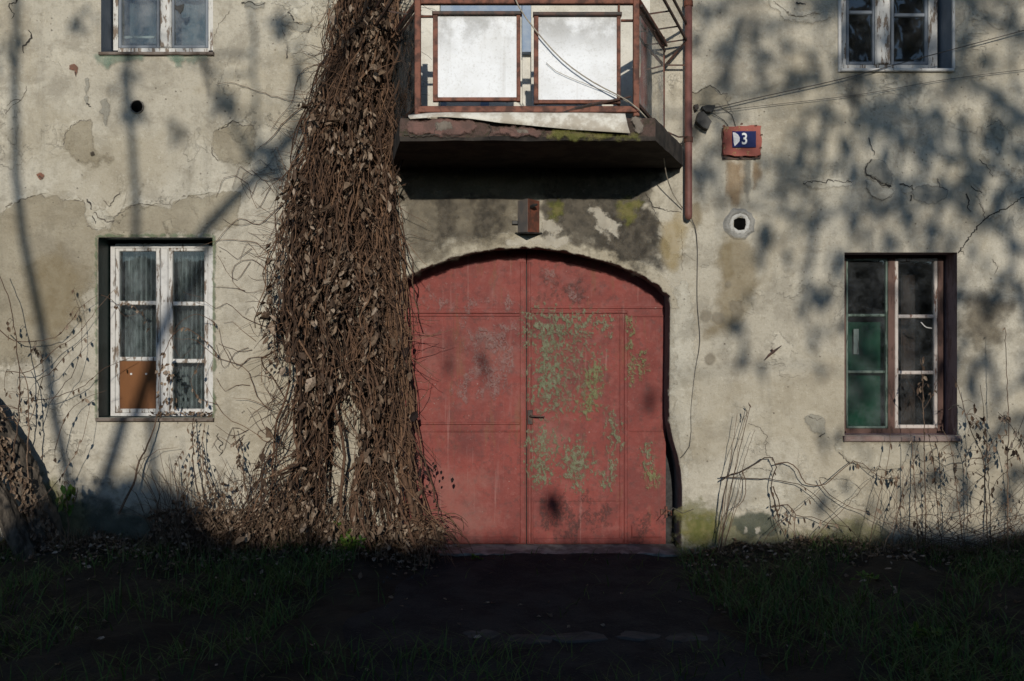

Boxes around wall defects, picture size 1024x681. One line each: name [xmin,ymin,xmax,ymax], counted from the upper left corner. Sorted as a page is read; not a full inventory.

flaking render [63,64,113,167]
flaking render [211,116,256,165]
peeling [0,173,241,375]
damp [398,168,568,267]
damp [590,208,667,260]
crack [958,159,1024,253]